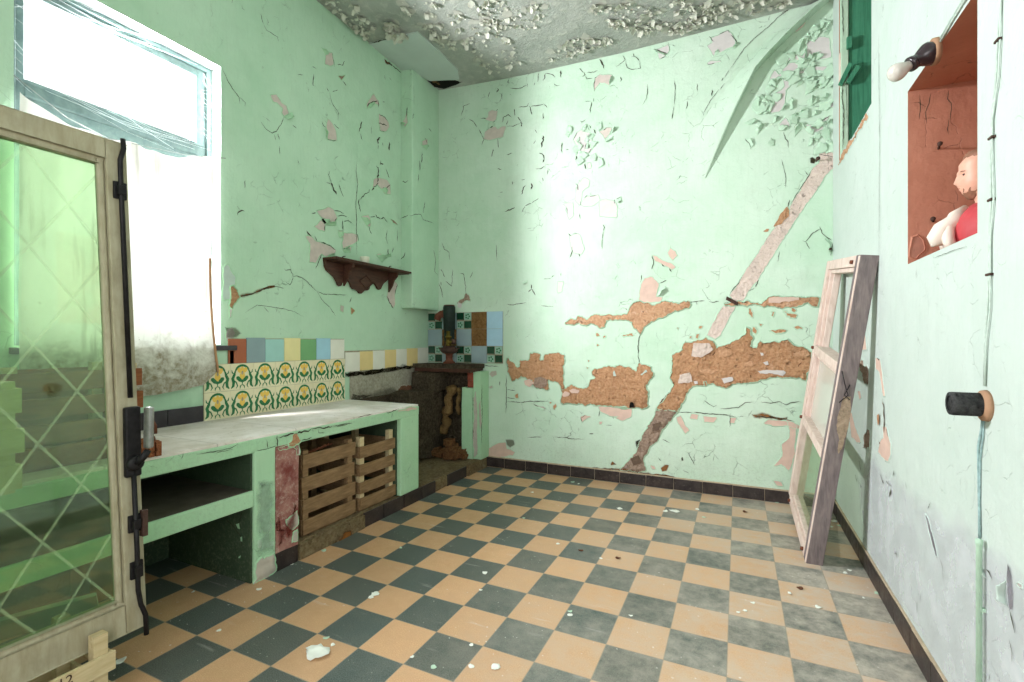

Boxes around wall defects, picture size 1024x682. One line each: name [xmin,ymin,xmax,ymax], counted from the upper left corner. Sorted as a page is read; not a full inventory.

peeling [324,0,549,75]
peeling [544,0,792,65]
crack [299,67,431,251]
crack [461,53,648,212]
crack [241,269,341,316]
peeling [305,207,398,267]
crack [402,204,473,297]
spalling [473,18,869,473]
peeling [849,333,892,463]
peeling [764,419,800,487]